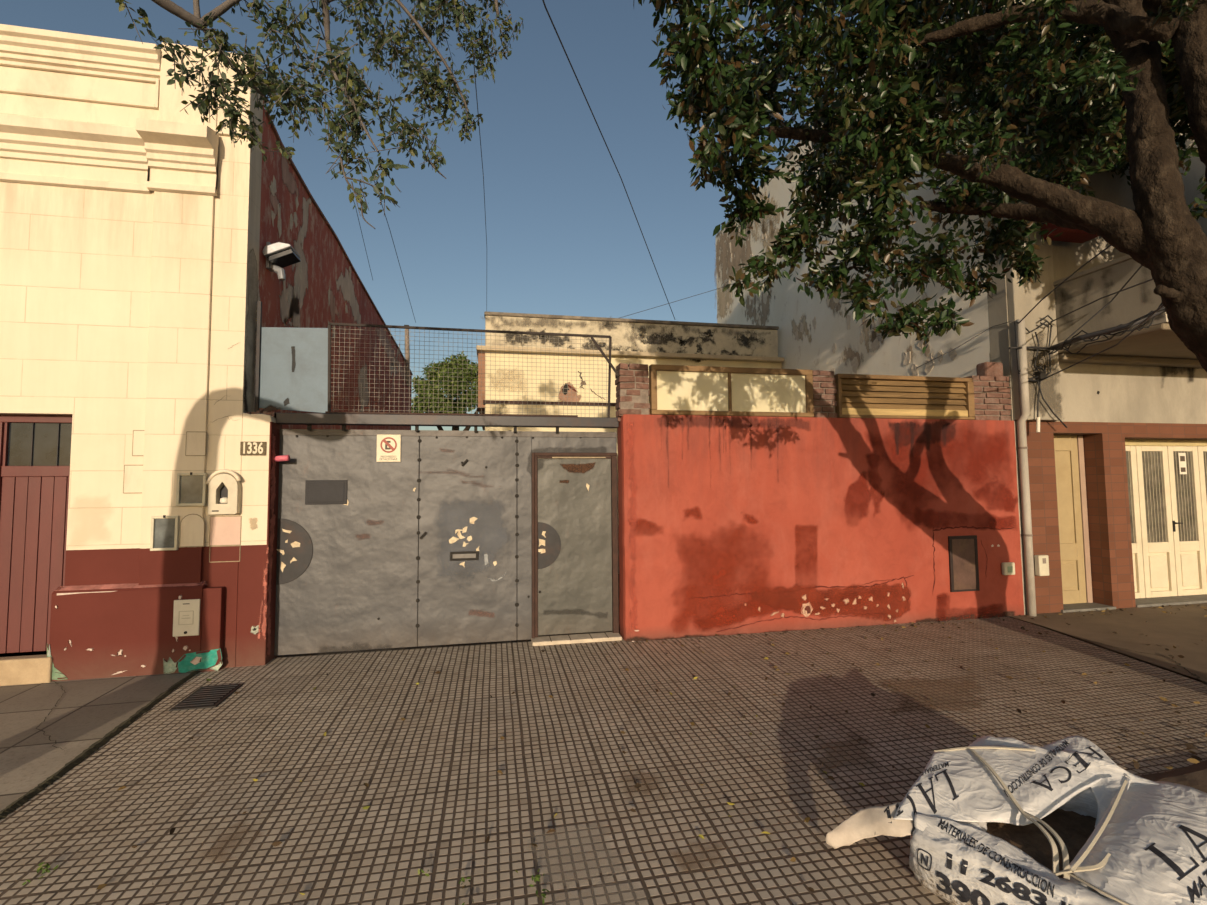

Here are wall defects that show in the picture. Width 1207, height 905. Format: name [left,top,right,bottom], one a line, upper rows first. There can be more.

flaking render [244,249,276,418]
peeling [269,146,311,328]
peeling [328,266,361,337]
peeling [714,192,780,326]
peeling [826,271,889,375]
peeling [903,332,957,376]
damp [846,420,1016,530]
peeling [47,640,94,680]
peeling [163,637,223,674]
peeling [250,433,276,657]
damp [626,516,795,642]
spalling [801,602,813,617]